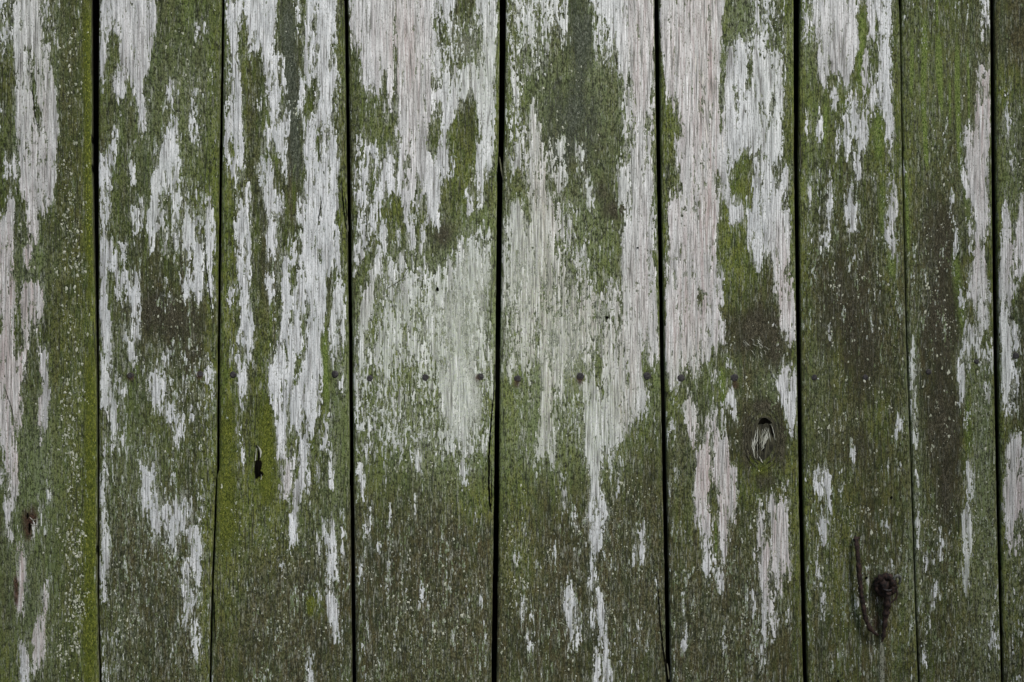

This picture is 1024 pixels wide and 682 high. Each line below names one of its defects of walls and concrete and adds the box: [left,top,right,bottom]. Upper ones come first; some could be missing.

water stain [874,114,883,159]
peeling [0,0,84,682]
peeling [93,0,225,682]
peeling [214,0,1024,682]
water stain [929,215,964,359]
water stain [219,415,235,544]
water stain [260,406,273,498]
water stain [929,391,970,453]